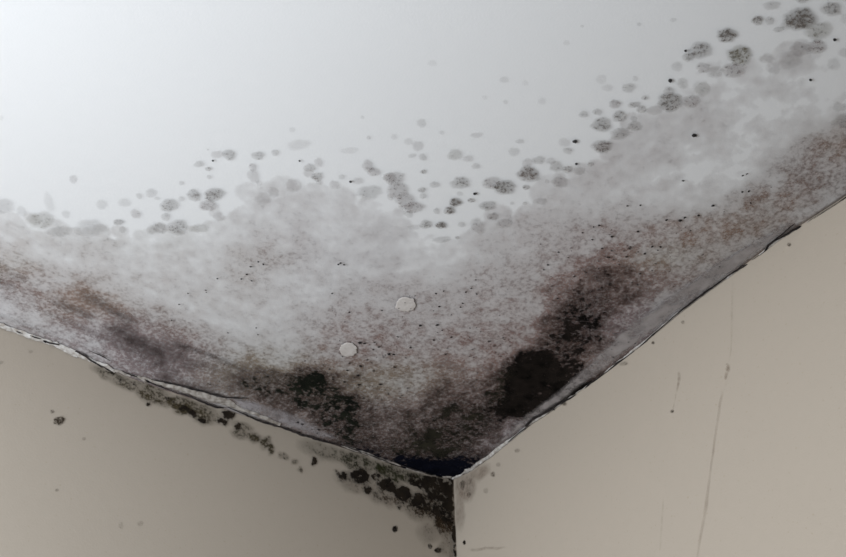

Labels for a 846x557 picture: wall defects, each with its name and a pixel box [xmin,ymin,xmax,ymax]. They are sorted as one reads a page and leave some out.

water stain [786,9,814,29]
spalling [339,343,357,357]
water stain [0,133,846,557]